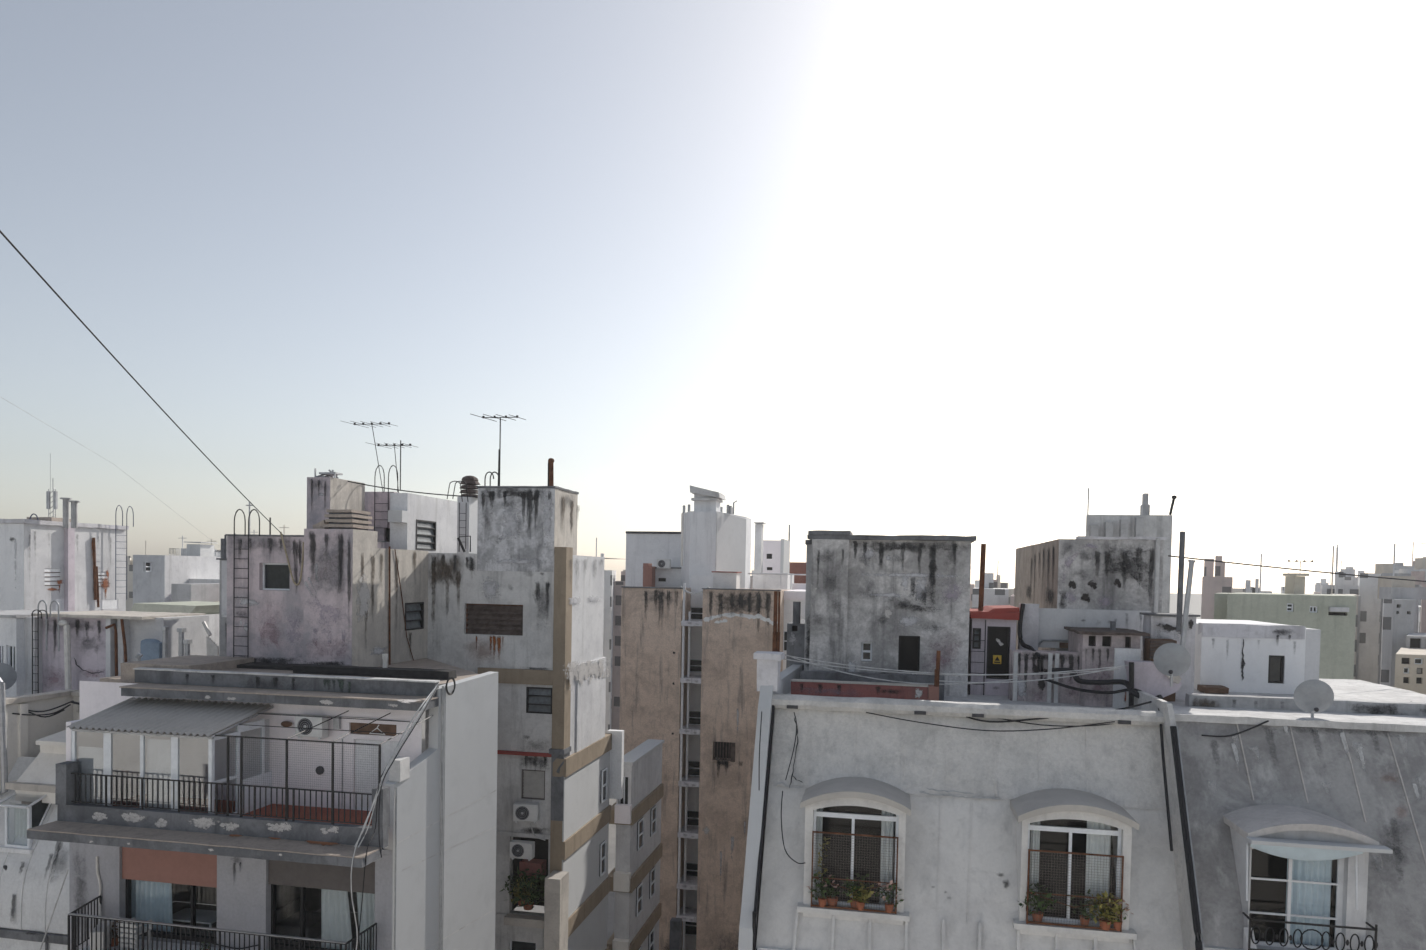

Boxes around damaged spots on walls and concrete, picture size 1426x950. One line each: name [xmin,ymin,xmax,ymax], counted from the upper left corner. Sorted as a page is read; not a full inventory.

leakage [481,490,579,528]
leakage [268,533,473,620]
leakage [817,541,957,611]
leakage [1031,547,1054,579]
leakage [1095,549,1154,586]
leakage [709,591,771,626]
leakage [45,620,100,650]
corrosion [476,636,503,655]